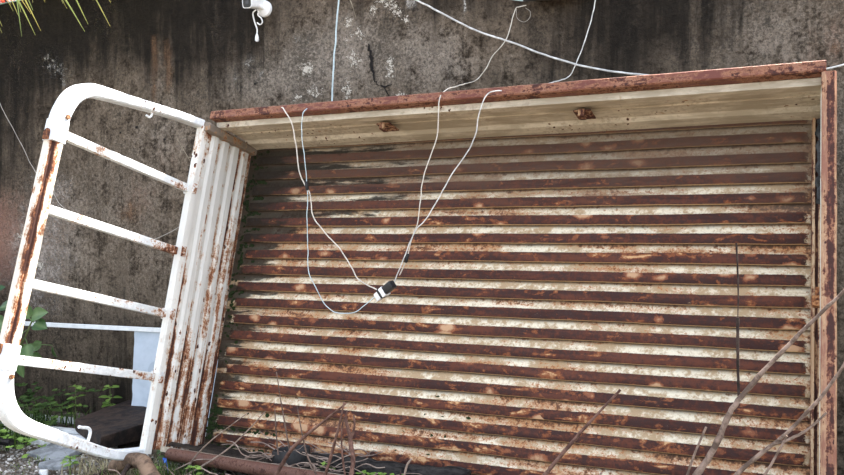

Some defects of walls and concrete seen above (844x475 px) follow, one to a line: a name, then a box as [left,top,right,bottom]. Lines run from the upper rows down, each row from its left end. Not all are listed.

crack [367,44,392,96]